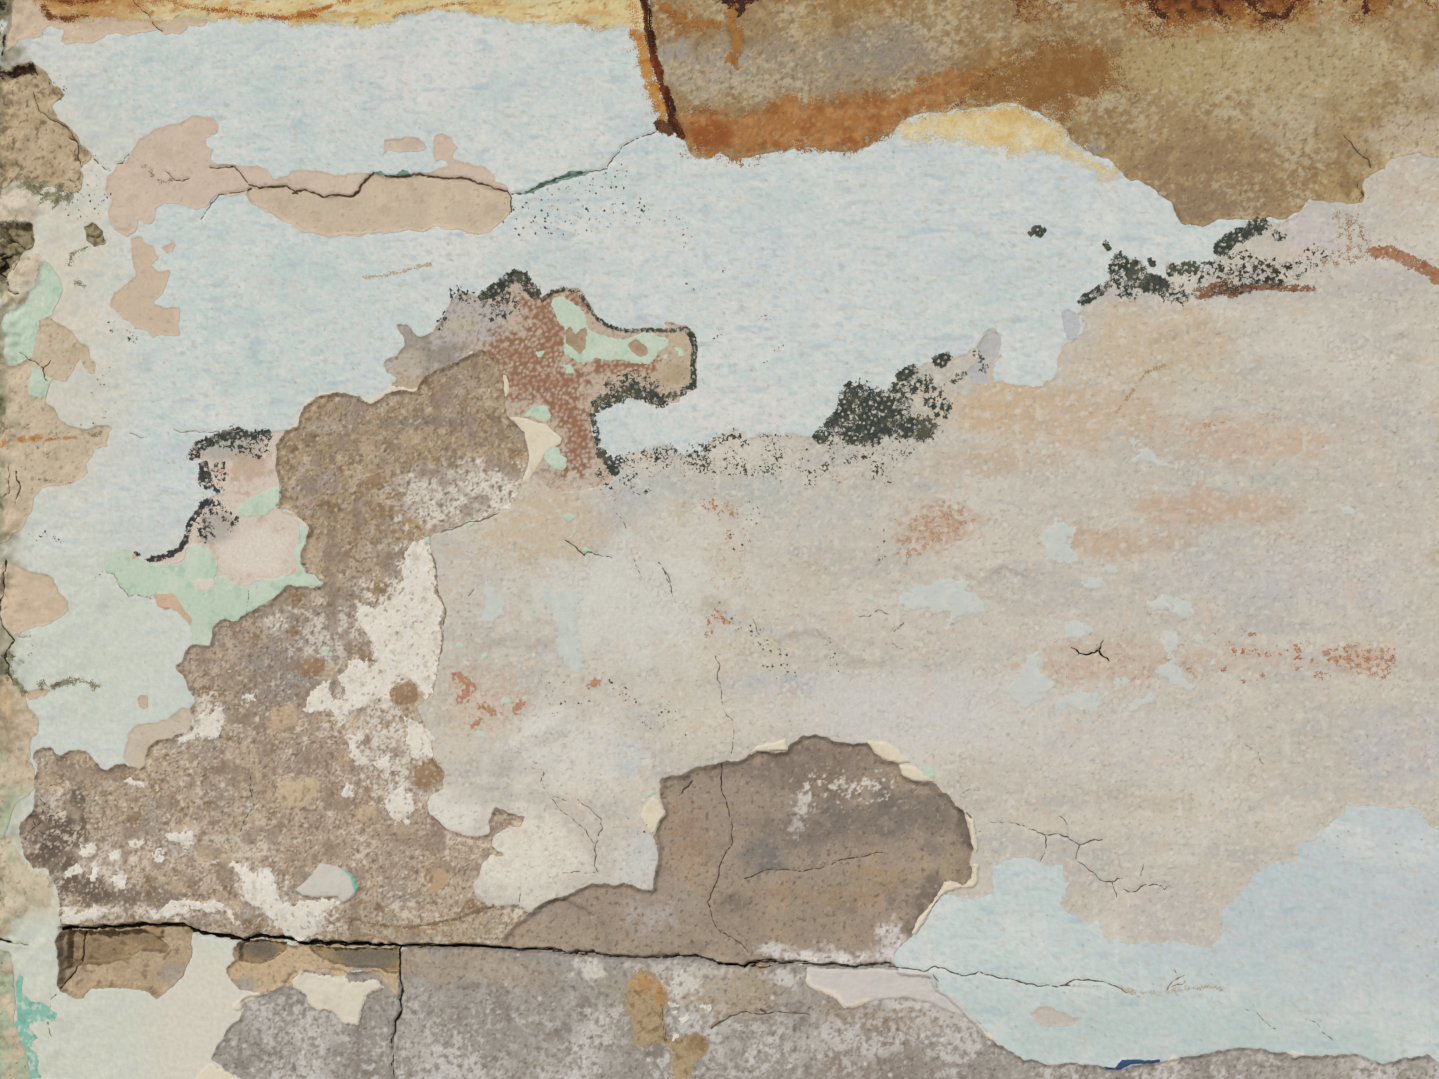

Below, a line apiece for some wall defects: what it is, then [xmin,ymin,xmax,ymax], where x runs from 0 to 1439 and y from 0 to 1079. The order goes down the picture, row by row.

corrosion [32,0,1438,190]
peeling [84,115,590,338]
crack [167,129,659,219]
water stain [1027,225,1047,238]
water stain [1077,216,1330,306]
water stain [134,425,273,562]
peeling [153,429,300,586]
peeling [104,527,321,646]
crack [21,783,65,851]
crack [47,655,1185,1079]
spalling [54,924,194,999]
spalling [194,938,1439,1079]